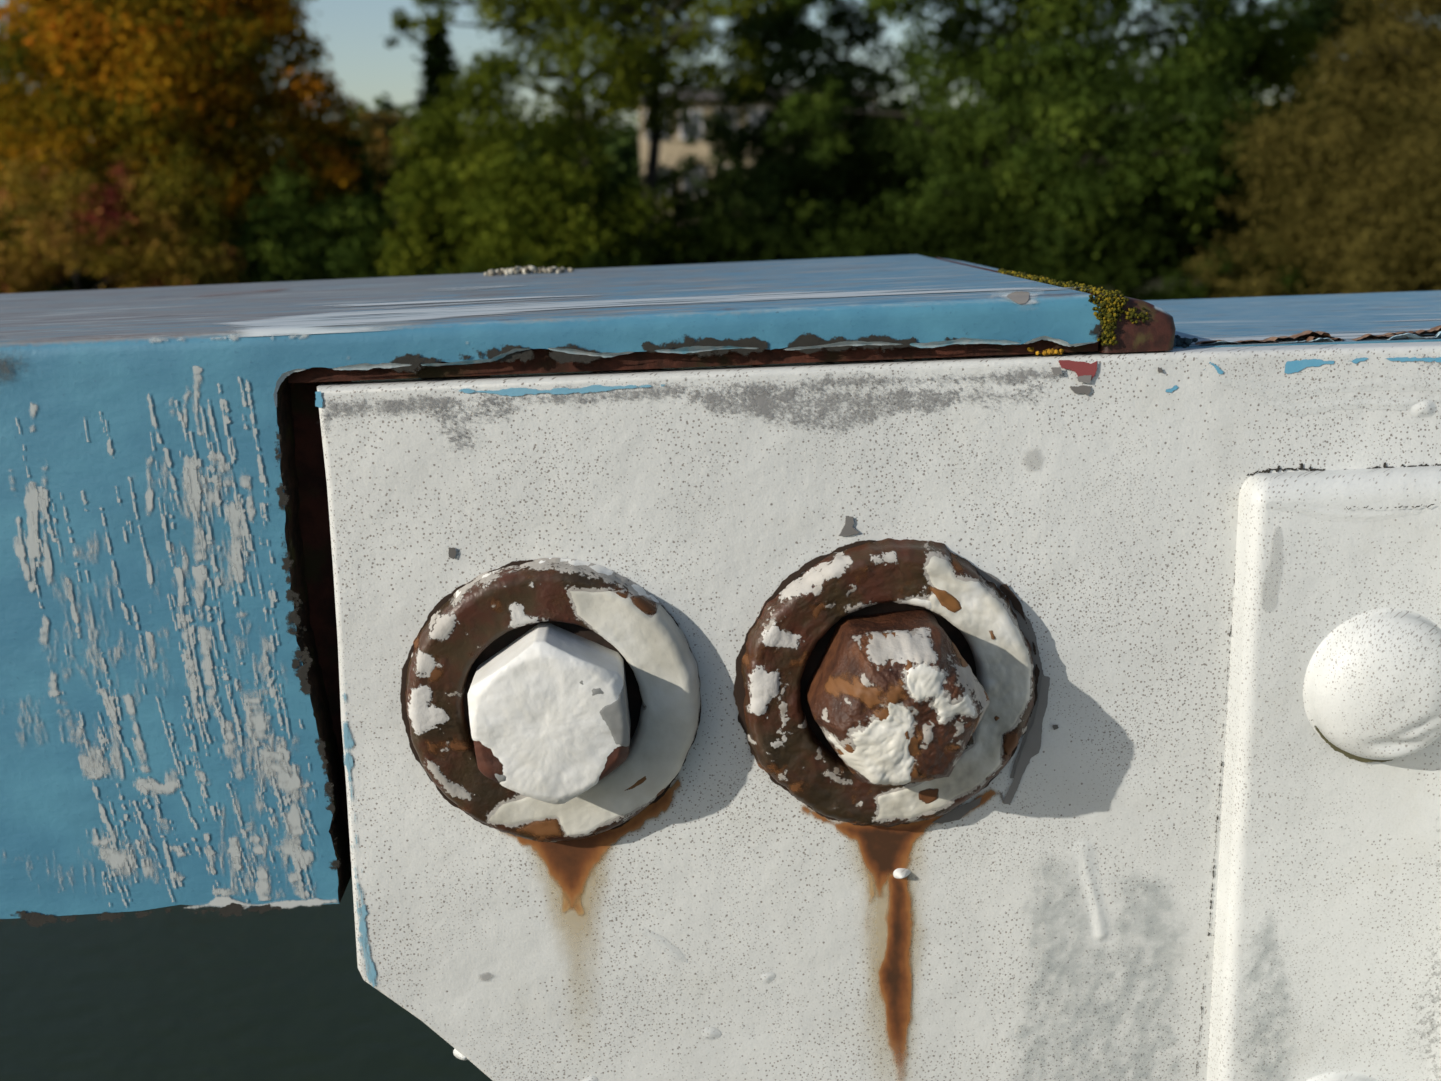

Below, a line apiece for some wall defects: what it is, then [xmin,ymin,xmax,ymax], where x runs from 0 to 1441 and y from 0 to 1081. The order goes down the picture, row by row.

peeling [273,369,306,408]
peeling [275,432,289,510]
peeling [281,537,313,695]
corrosion [291,381,351,861]
peeling [315,738,335,819]
corrosion [965,789,996,815]
corrosion [507,779,680,928]
spalling [0,896,337,928]
corrosion [802,806,945,1066]